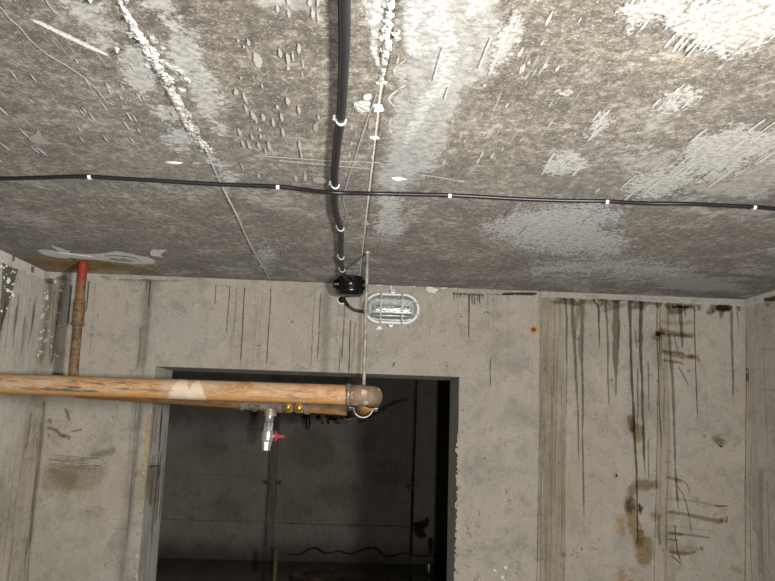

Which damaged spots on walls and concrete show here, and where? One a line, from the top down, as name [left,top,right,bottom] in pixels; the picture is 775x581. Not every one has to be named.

damp [117,0,269,278]
damp [356,0,506,276]